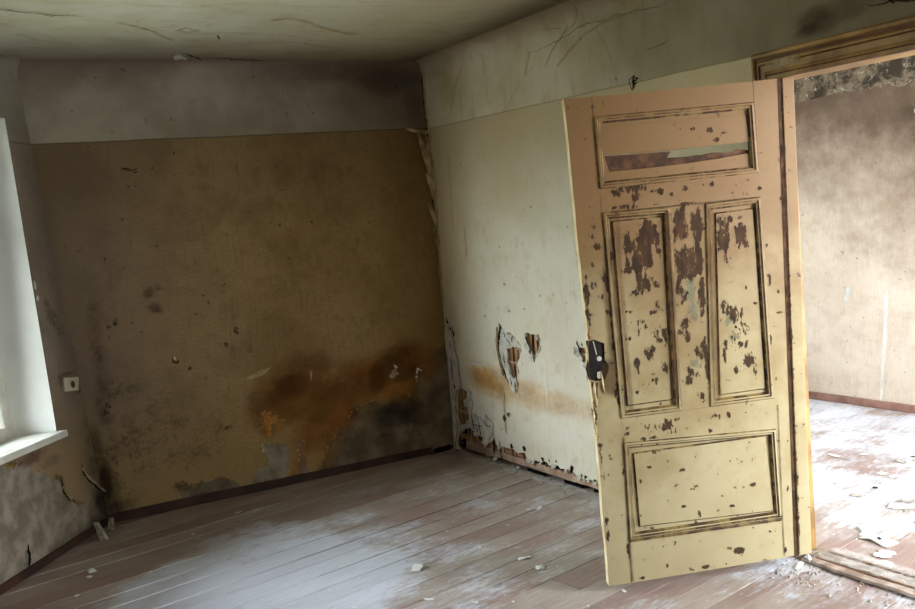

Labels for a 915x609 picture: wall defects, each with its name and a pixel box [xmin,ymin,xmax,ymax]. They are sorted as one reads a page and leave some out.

crack [861,0,915,8]
flaking render [321,318,612,493]
flaking render [0,461,106,584]